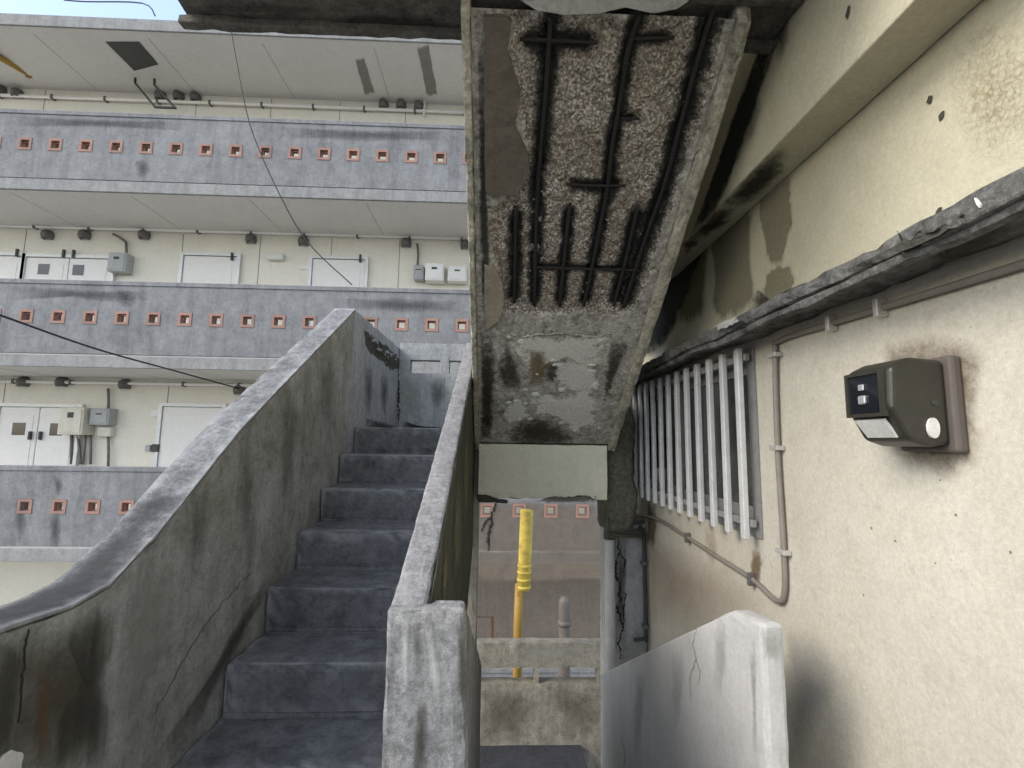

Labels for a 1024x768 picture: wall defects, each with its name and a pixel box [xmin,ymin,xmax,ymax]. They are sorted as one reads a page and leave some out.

spalling [471,0,738,444]
leakage [646,23,793,354]
leakage [481,344,520,437]
leakage [511,419,570,445]
leakage [546,360,566,382]
leakage [604,344,626,401]
crack [481,503,496,551]
crack [614,537,627,660]
crack [17,629,30,723]